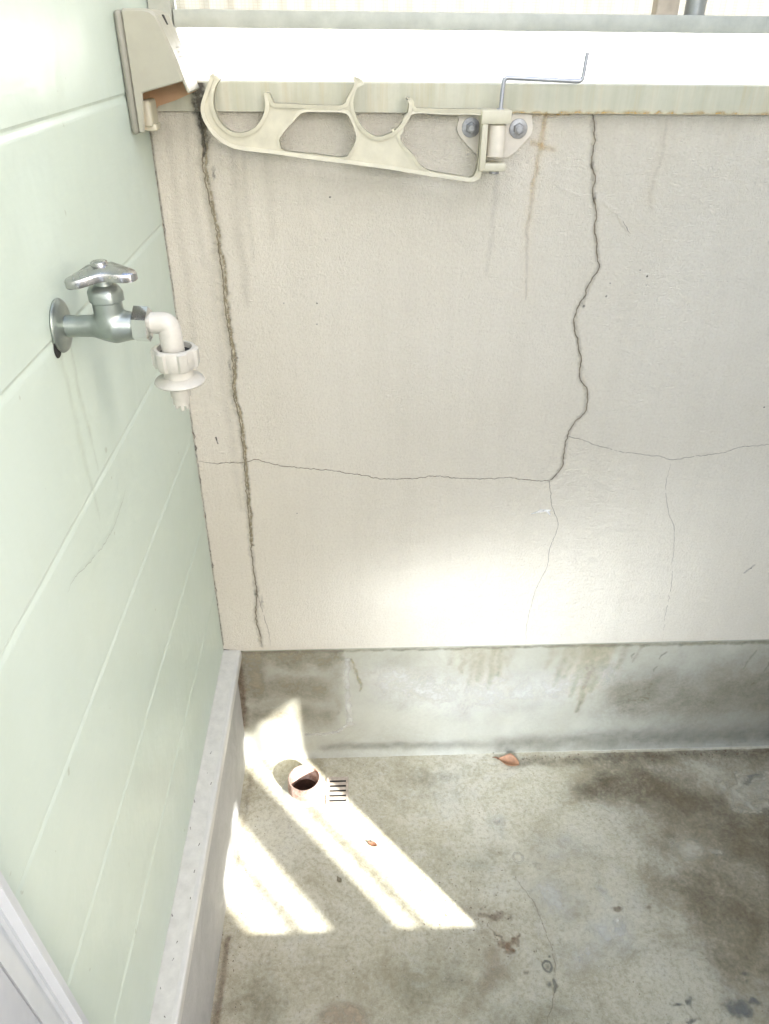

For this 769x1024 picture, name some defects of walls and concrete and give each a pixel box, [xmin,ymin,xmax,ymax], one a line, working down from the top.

crack [201,114,769,646]